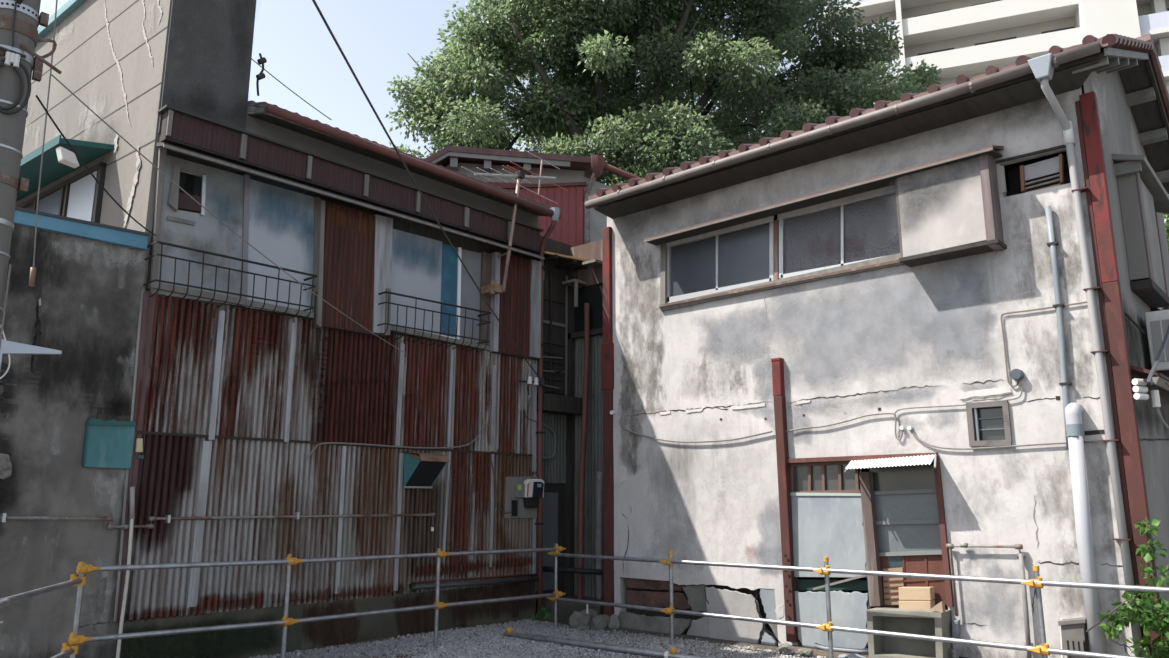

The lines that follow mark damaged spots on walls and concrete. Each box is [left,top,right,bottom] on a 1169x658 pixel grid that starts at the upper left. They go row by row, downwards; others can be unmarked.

crack [142,0,162,66]
crack [104,2,141,228]
damp [7,233,144,295]
damp [36,298,134,421]
damp [621,251,662,471]
crack [622,379,1001,417]
corrosion [118,293,535,646]
crack [755,591,780,644]